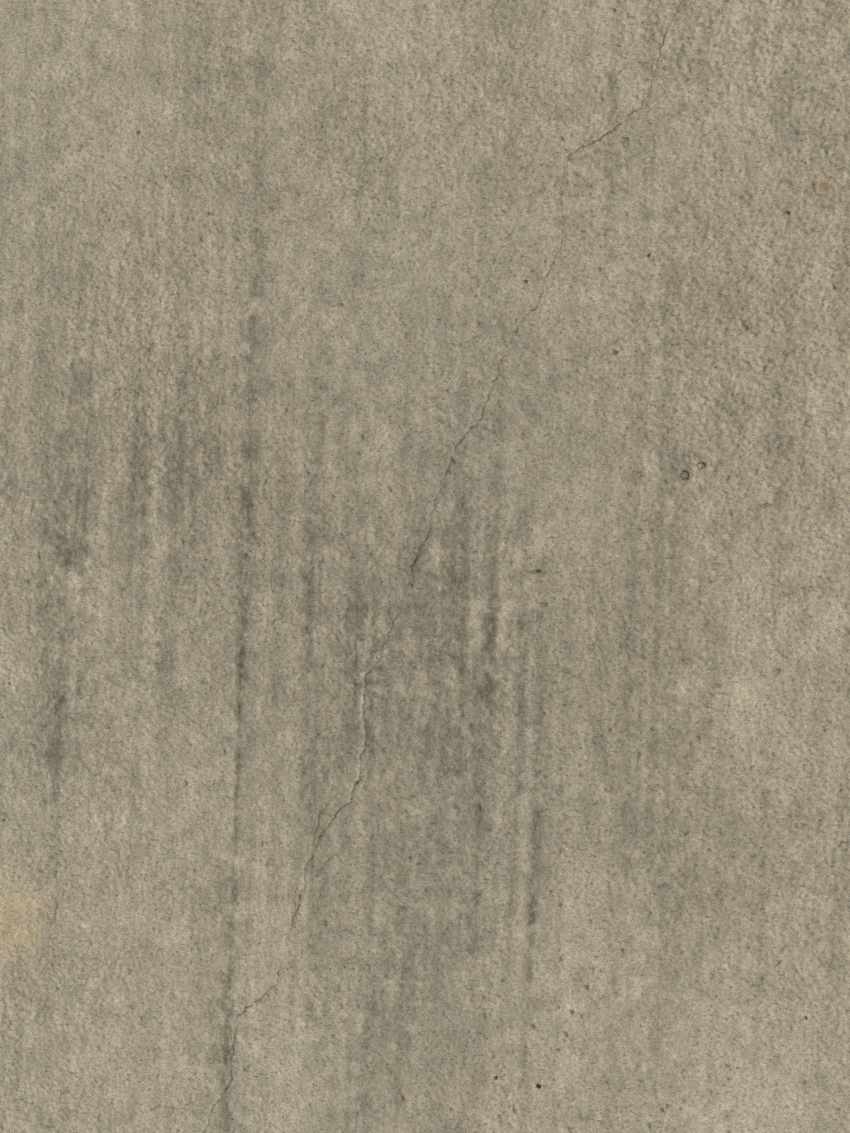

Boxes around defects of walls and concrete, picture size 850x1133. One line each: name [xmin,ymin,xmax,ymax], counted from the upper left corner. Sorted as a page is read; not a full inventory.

crack [128,0,685,1133]